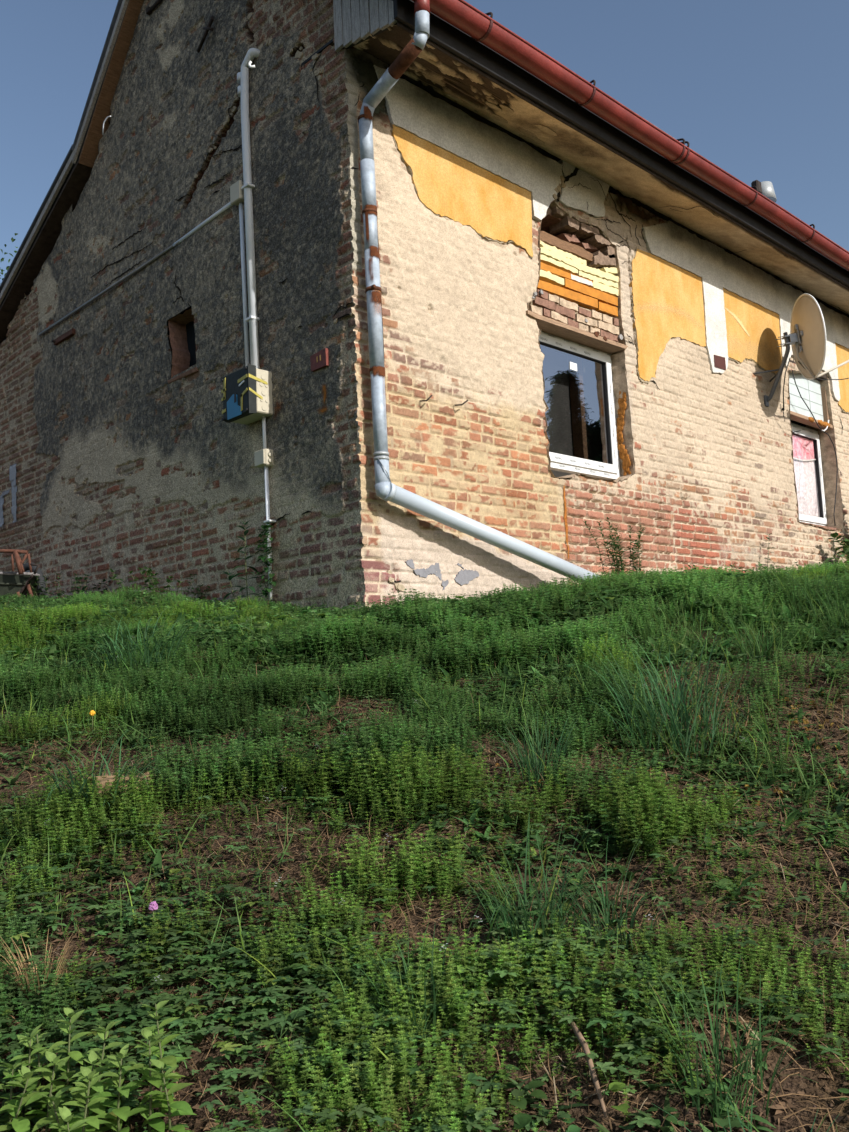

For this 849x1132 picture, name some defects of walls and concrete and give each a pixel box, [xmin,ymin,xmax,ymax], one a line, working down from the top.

crack [174,84,242,211]
flaking render [390,123,616,269]
spalling [616,190,672,221]
flaking render [629,247,706,384]
flaking render [723,288,782,375]
flaking render [835,343,849,414]
spalling [74,457,147,505]
spalling [387,570,405,591]
peeling [405,559,479,590]